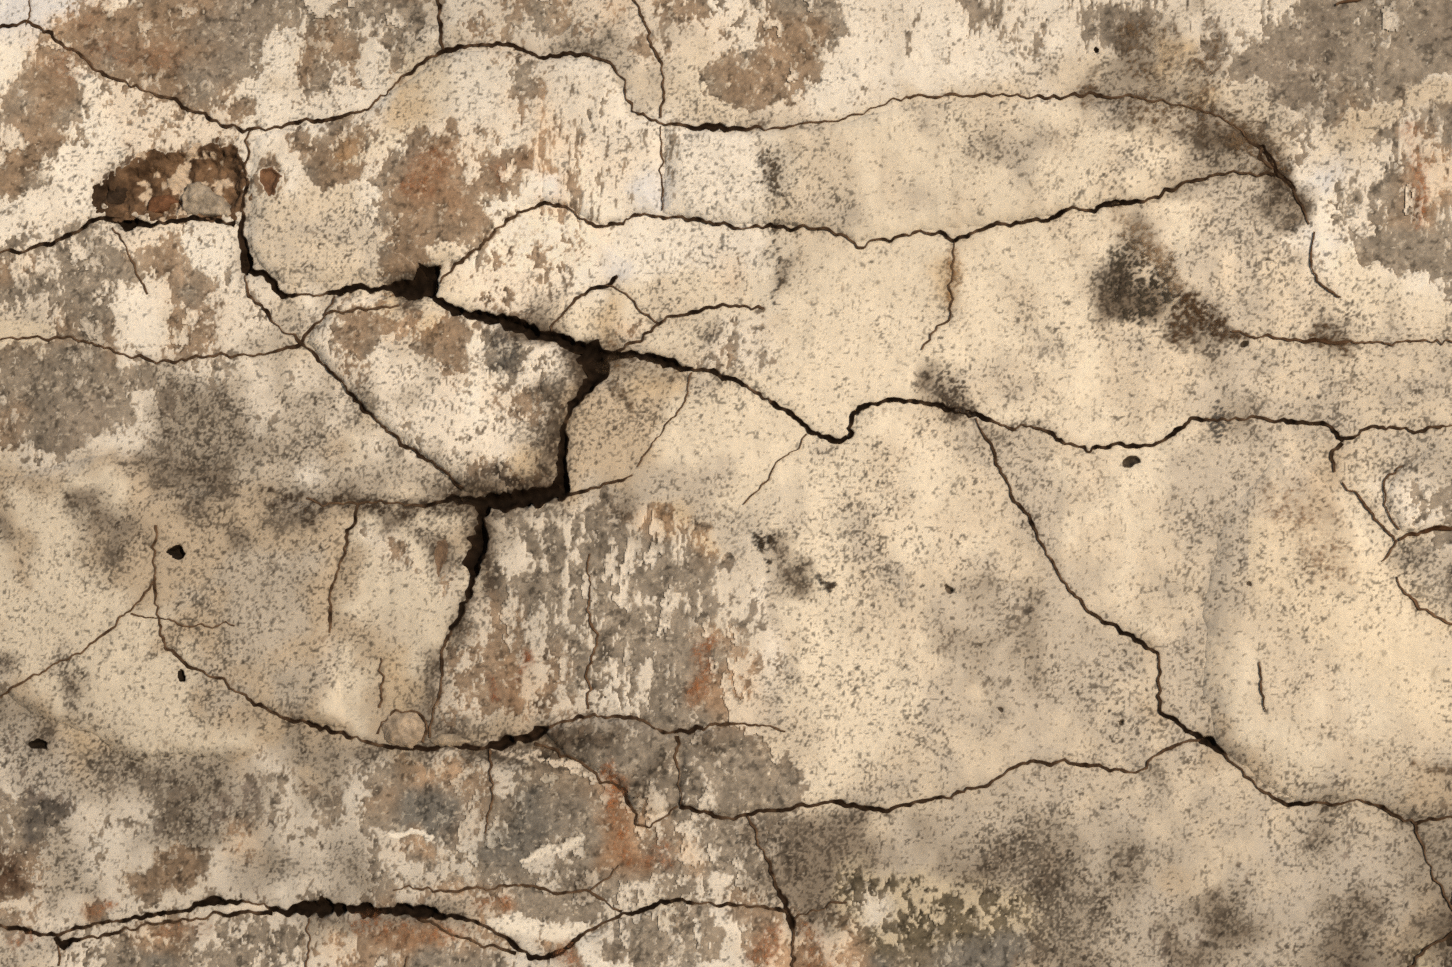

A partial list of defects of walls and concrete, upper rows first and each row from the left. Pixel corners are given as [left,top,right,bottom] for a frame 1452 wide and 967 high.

peeling [0,0,1048,967]
crack [0,0,1452,752]
crack [0,418,1452,967]
leakage [1103,210,1248,346]
peeling [1200,0,1452,302]